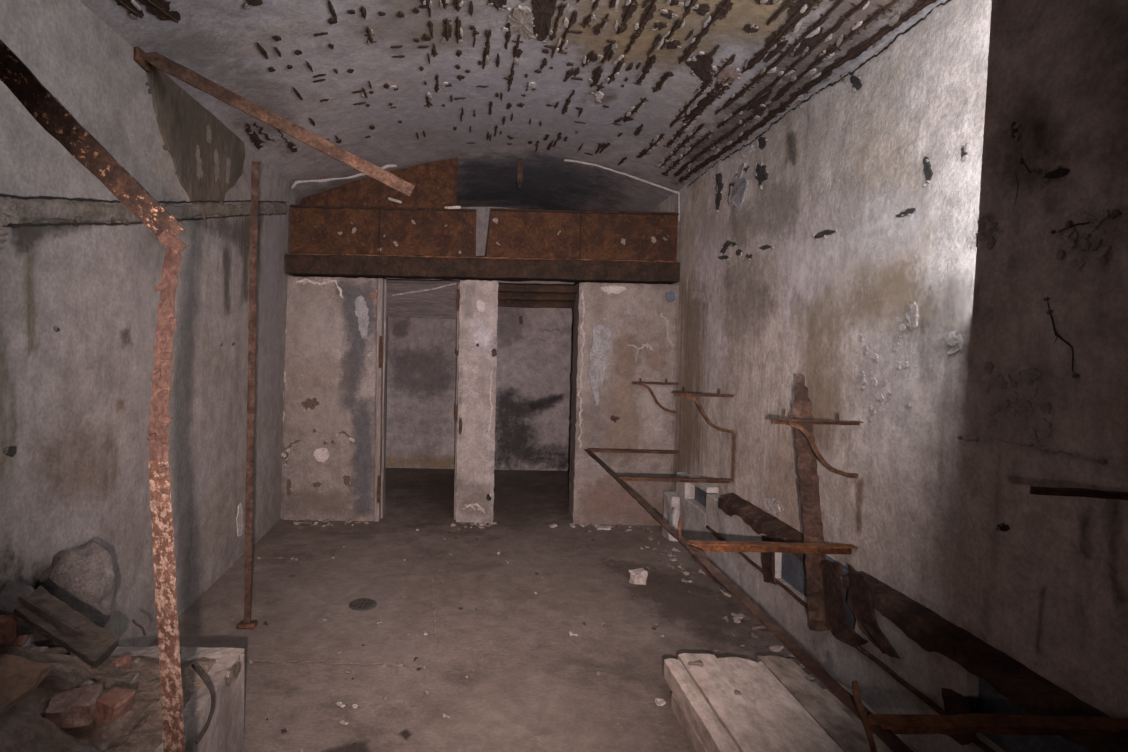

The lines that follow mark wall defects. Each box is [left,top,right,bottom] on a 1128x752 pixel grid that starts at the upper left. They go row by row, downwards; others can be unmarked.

spalling [115,0,181,23]
spalling [244,0,263,10]
spalling [257,35,354,83]
spalling [314,0,937,212]
flaking render [146,65,265,205]
flaking render [961,143,970,162]
flaking render [895,208,916,217]
crack [1043,296,1079,378]
leakage [339,282,375,512]
flaking render [313,427,355,462]